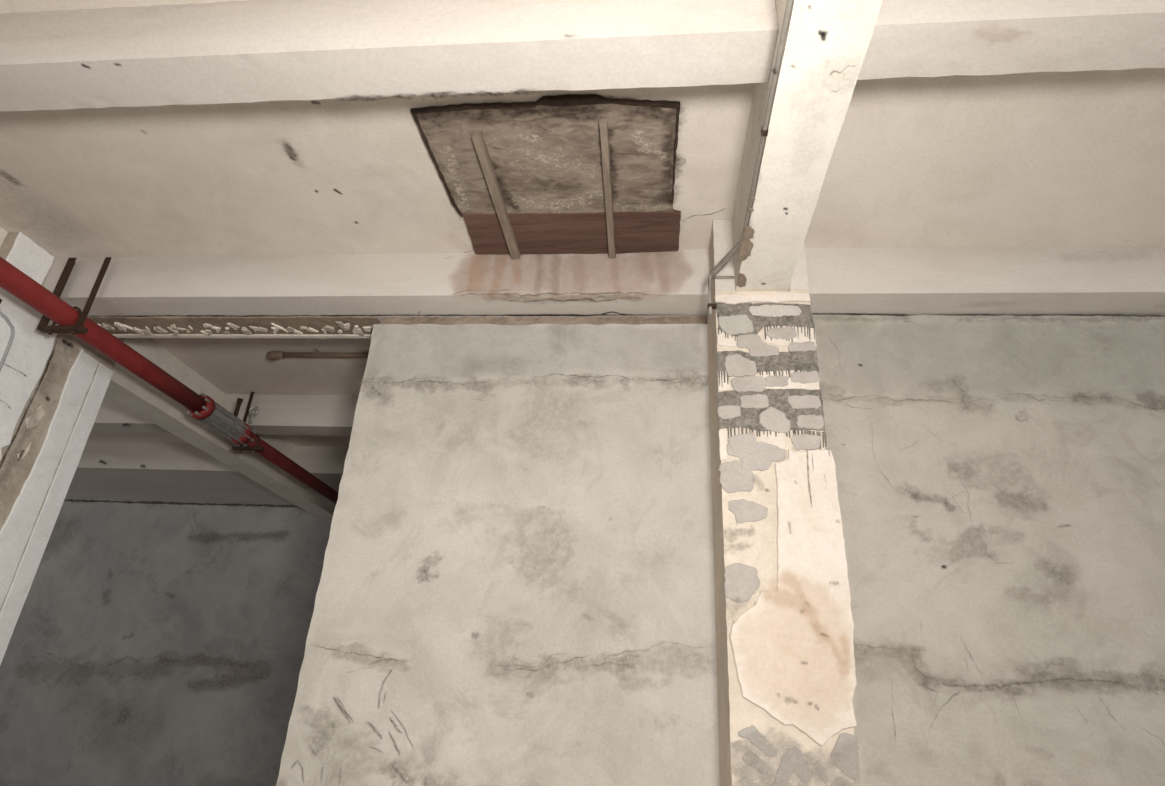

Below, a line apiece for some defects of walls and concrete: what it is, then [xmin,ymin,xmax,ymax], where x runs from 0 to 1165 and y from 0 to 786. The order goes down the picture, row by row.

peeling [729,450,857,746]